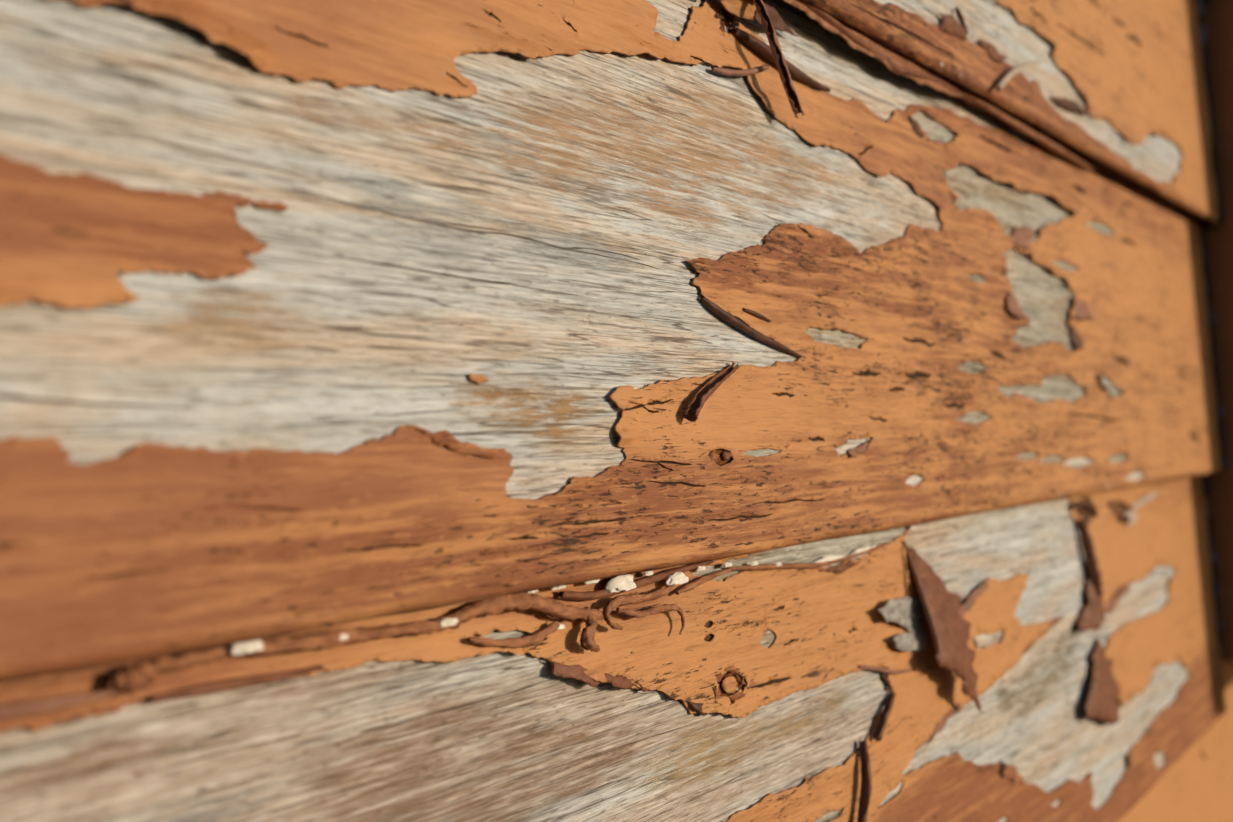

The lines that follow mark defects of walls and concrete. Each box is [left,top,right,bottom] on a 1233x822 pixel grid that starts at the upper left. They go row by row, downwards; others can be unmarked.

peeling [875,0,1182,183]
peeling [0,0,1032,500]
peeling [941,164,1094,352]
peeling [998,374,1121,404]
peeling [1015,452,1128,468]
peeling [0,491,1187,822]